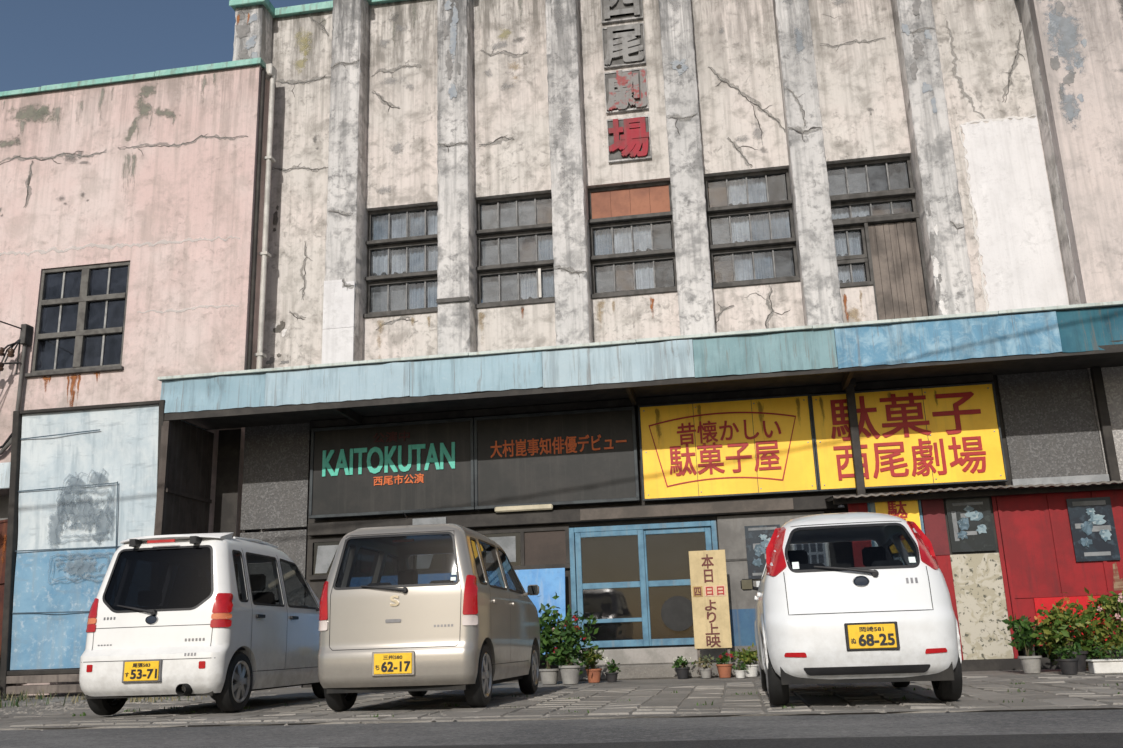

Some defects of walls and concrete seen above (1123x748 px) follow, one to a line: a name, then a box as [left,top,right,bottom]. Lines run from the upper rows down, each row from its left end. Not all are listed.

peeling [235,10,258,60]
crack [277,60,417,112]
crack [709,67,822,167]
crack [821,14,1025,119]
peeling [1039,1,1087,102]
crack [0,134,248,208]
rust [67,372,100,406]